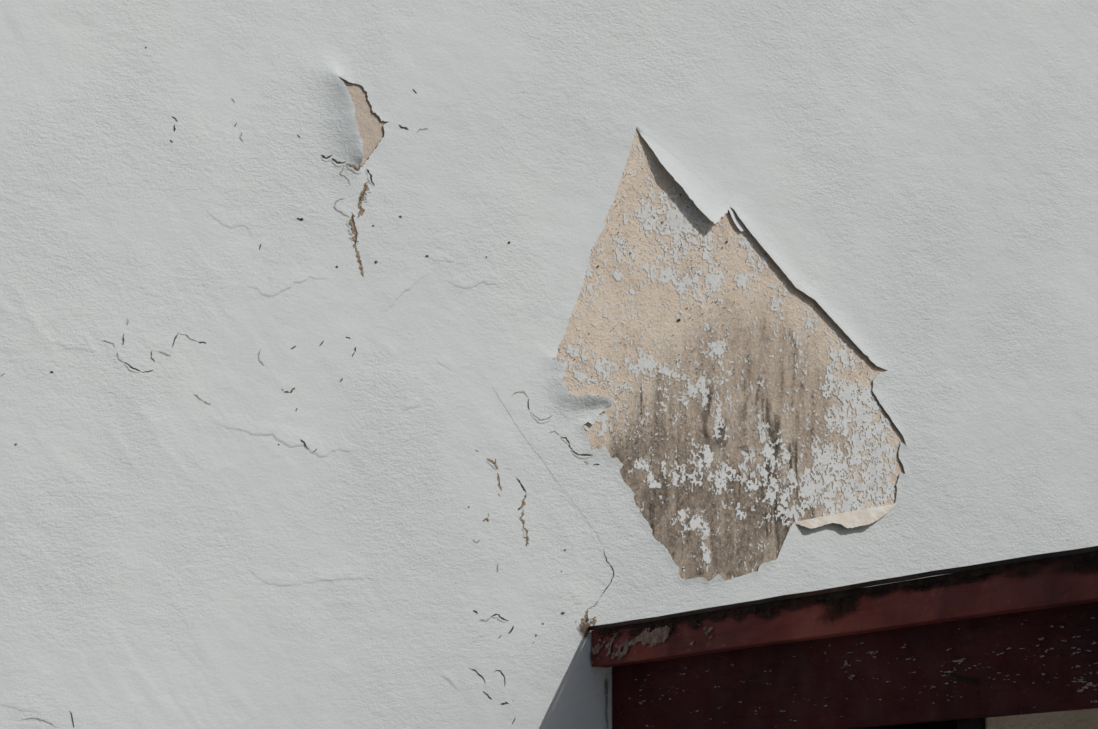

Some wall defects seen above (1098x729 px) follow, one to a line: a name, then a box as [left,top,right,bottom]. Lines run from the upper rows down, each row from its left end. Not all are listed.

peeling [340,77,388,166]
crack [320,155,375,276]
peeling [553,127,906,581]
crack [473,450,531,546]
crack [494,389,614,620]
leakage [641,390,813,579]
spalling [919,648,1019,704]
spalling [993,626,1098,703]